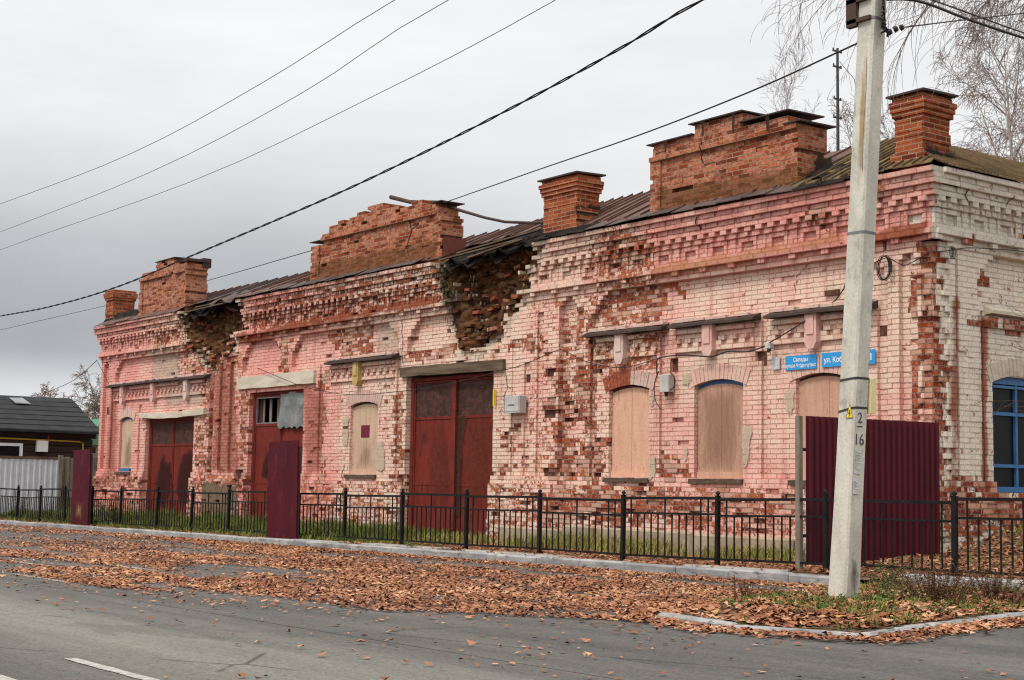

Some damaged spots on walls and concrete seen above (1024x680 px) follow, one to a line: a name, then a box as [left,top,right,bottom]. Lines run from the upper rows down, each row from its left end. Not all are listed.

spalling [911,277,943,318]
spalling [916,240,946,263]
peeling [498,232,795,529]
peeling [188,389,264,490]
spalling [911,343,1022,526]